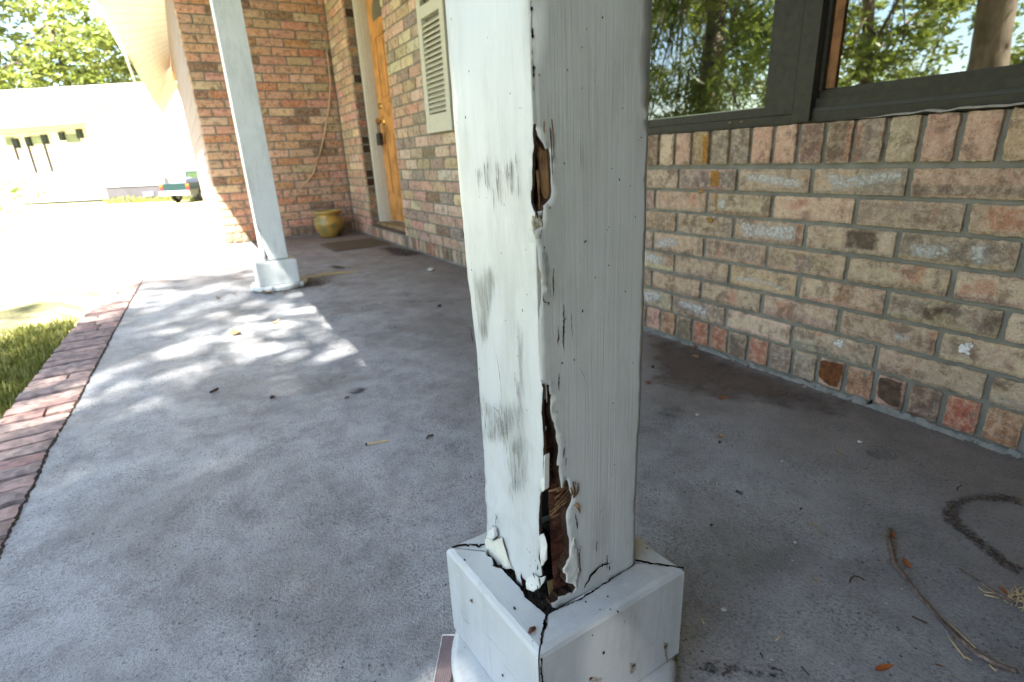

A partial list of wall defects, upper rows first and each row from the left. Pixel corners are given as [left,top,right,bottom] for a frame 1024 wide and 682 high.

peeling [531,211,543,239]
peeling [540,453,549,492]
crack [452,542,485,550]
peeling [485,515,512,569]
peeling [526,533,547,600]
peeling [563,538,580,589]
crack [540,515,684,682]